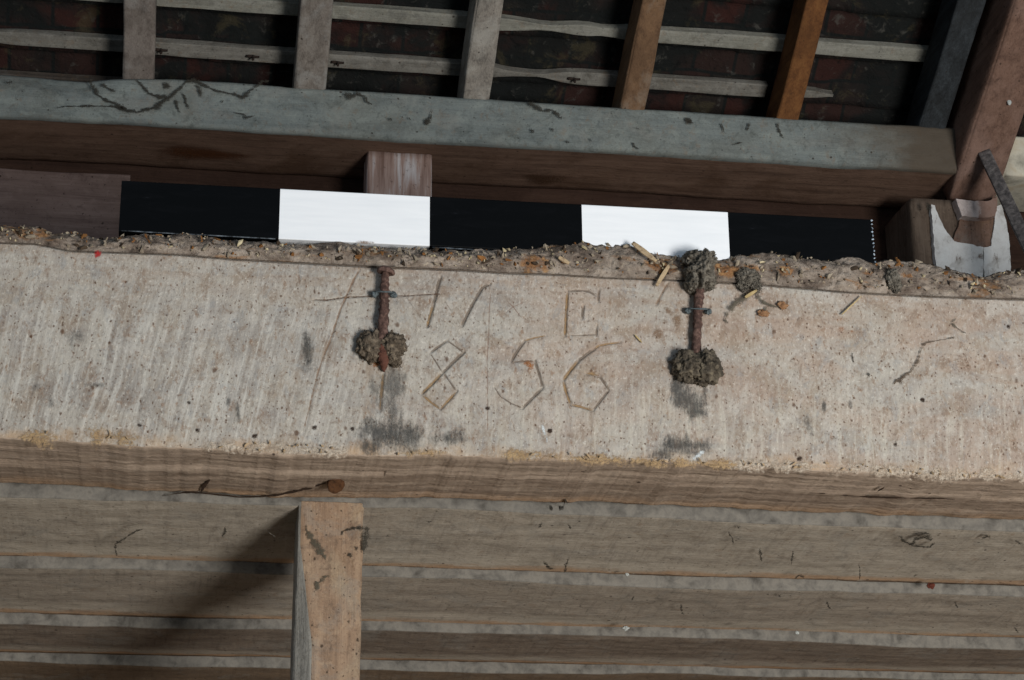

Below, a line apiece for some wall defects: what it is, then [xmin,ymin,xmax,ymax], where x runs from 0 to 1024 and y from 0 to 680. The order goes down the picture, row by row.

damp [670,378,706,419]
damp [361,419,424,454]
damp [656,436,710,459]
crack [163,480,325,498]